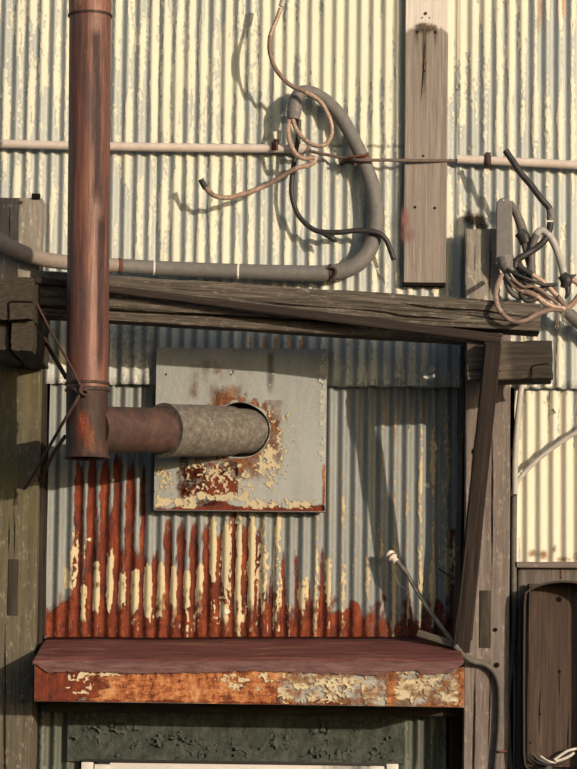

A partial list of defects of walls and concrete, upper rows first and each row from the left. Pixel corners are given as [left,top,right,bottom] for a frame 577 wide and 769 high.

peeling [0,0,69,244]
peeling [111,0,413,295]
peeling [423,166,575,304]
peeling [447,0,577,206]
peeling [48,321,66,382]
peeling [109,324,138,383]
corrosion [45,388,456,638]
peeling [58,337,455,637]
peeling [510,315,577,562]
peeling [65,671,121,698]
corrosion [34,664,465,707]
peeling [215,671,463,706]